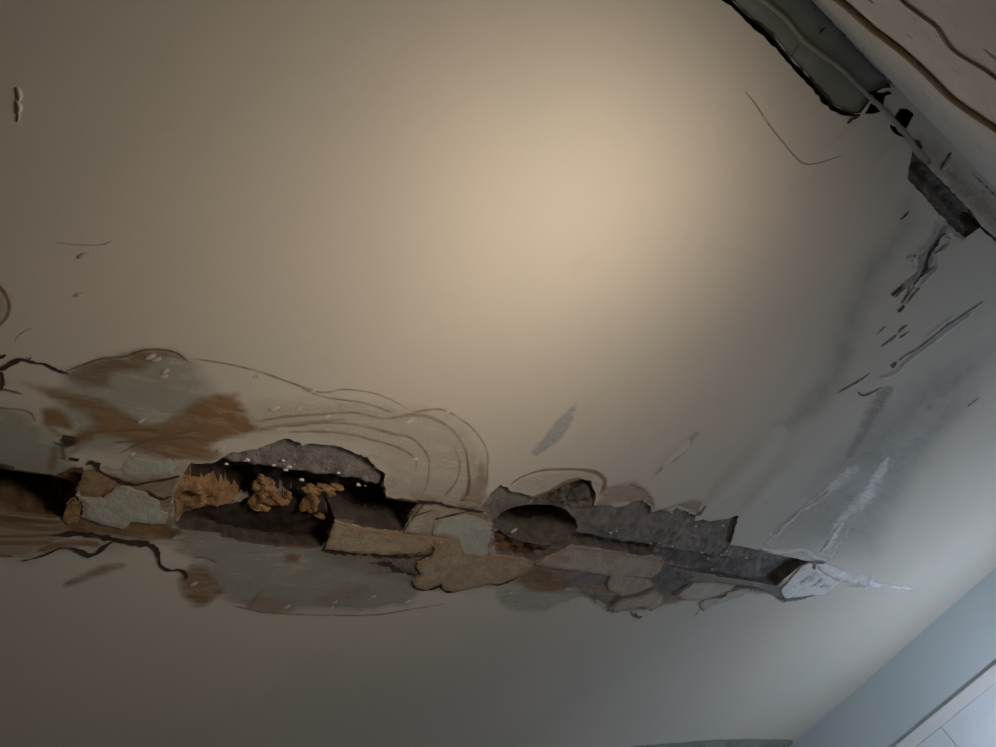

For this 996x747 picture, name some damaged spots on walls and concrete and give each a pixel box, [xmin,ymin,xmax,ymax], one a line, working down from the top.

crack [722,0,861,124]
crack [810,0,895,88]
crack [746,93,840,165]
spalling [890,109,982,313]
crack [940,152,996,197]
crack [974,222,996,242]
crack [22,531,188,579]
spalling [0,439,812,612]